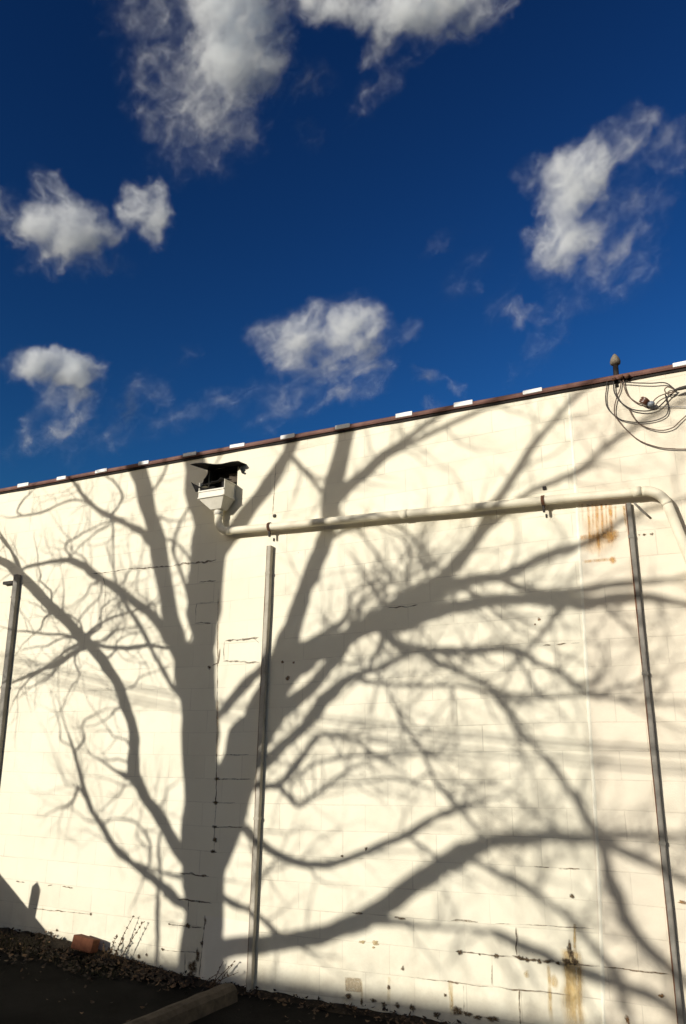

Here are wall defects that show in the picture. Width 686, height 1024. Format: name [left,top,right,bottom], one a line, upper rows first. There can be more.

crack [93,560,258,707]
rust [588,503,678,1024]
crack [411,920,665,1024]